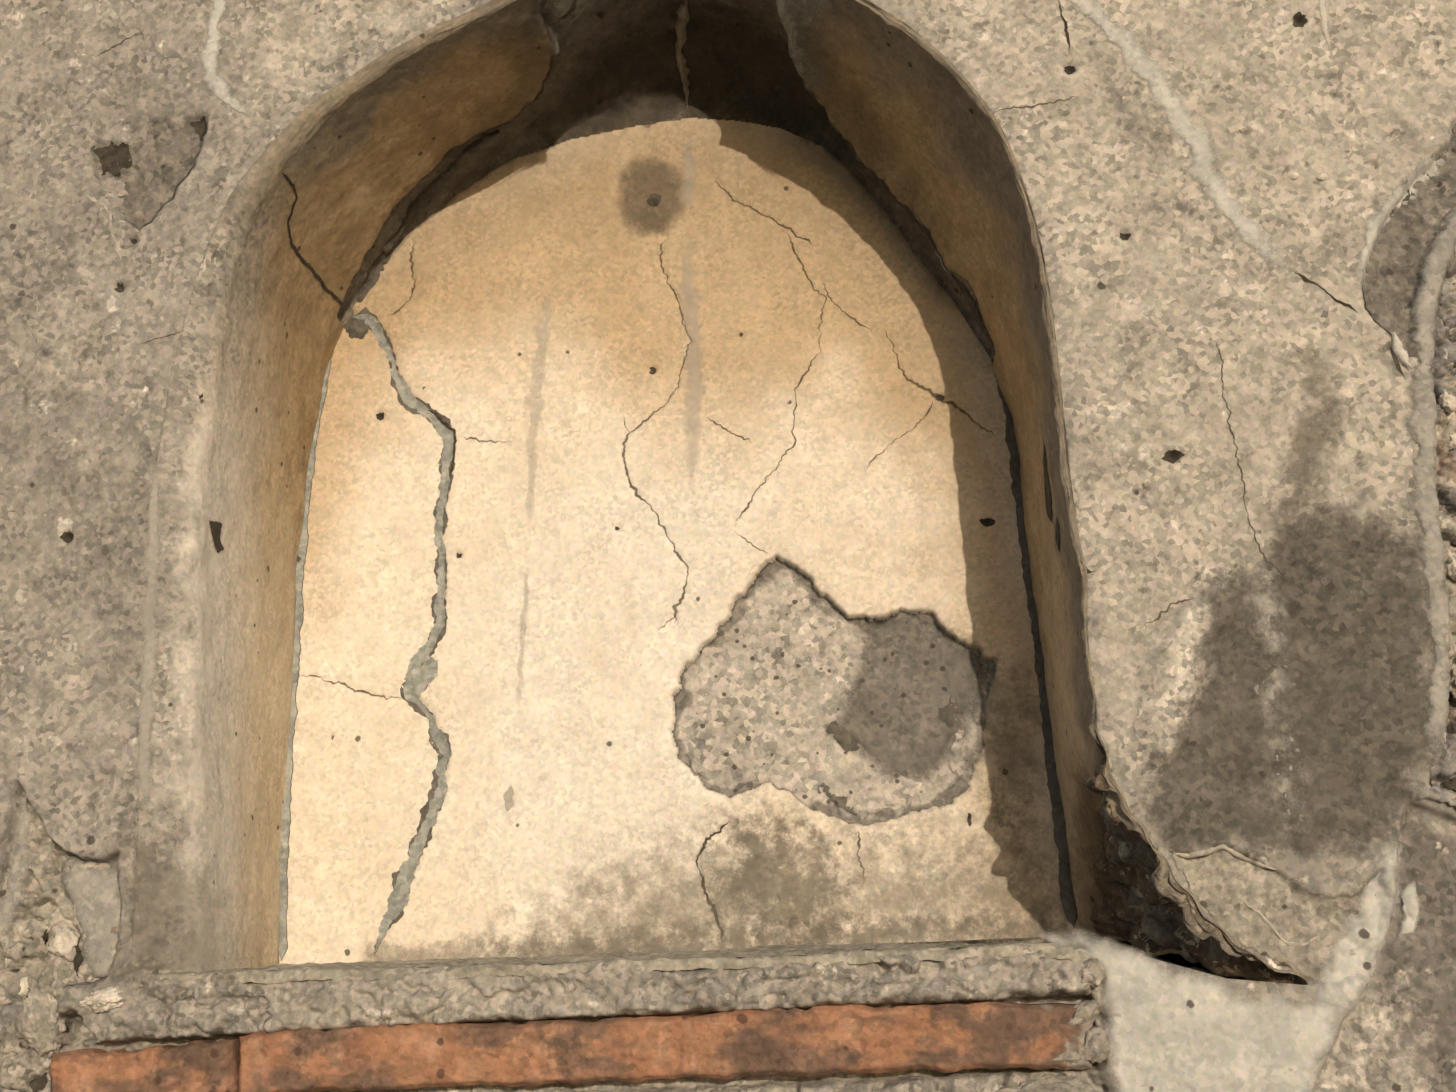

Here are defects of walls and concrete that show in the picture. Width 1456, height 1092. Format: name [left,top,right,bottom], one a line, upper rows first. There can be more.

spalling [83,117,207,259]
spalling [0,791,122,1092]
crack [279,173,512,961]
crack [622,240,692,629]
spalling [672,558,996,826]
crack [707,182,1078,928]
spalling [1084,701,1379,985]
leakage [1148,508,1433,851]
peeling [1388,332,1412,377]
spalling [1430,242,1456,669]
spalling [1430,692,1456,799]